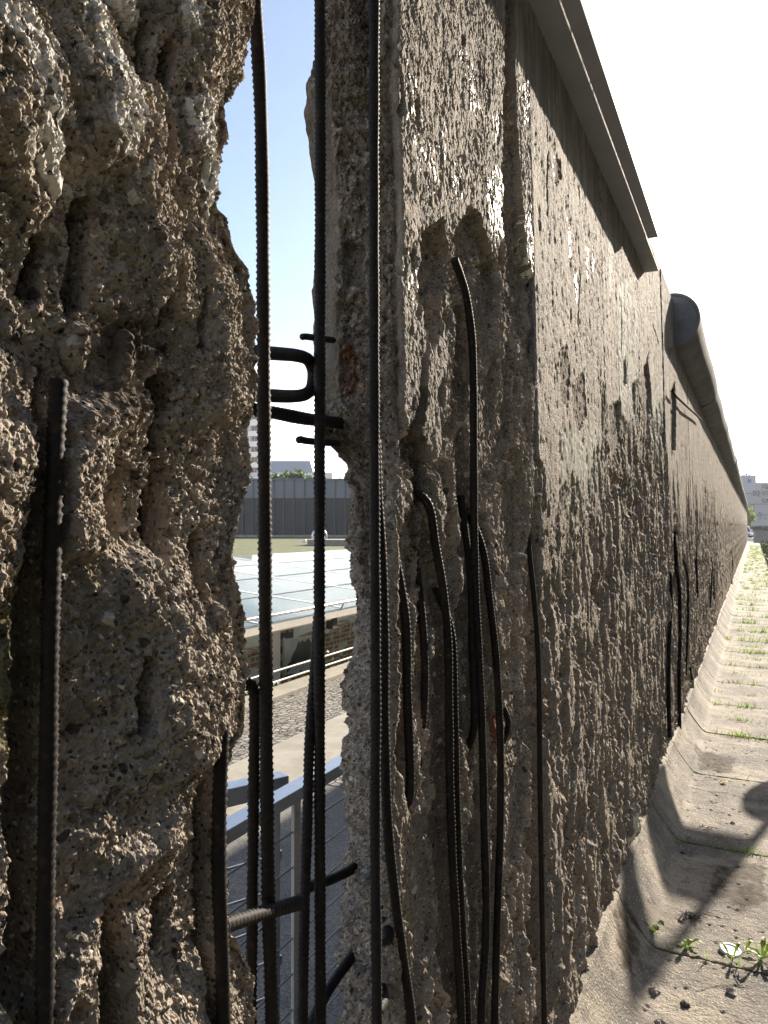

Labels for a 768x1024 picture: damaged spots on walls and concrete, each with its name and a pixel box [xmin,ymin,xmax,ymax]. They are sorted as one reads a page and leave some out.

peeling [0,0,77,235]
peeling [75,0,158,181]
peeling [164,92,224,233]
peeling [179,0,219,37]
spalling [210,0,547,1024]
spalling [34,378,69,1024]